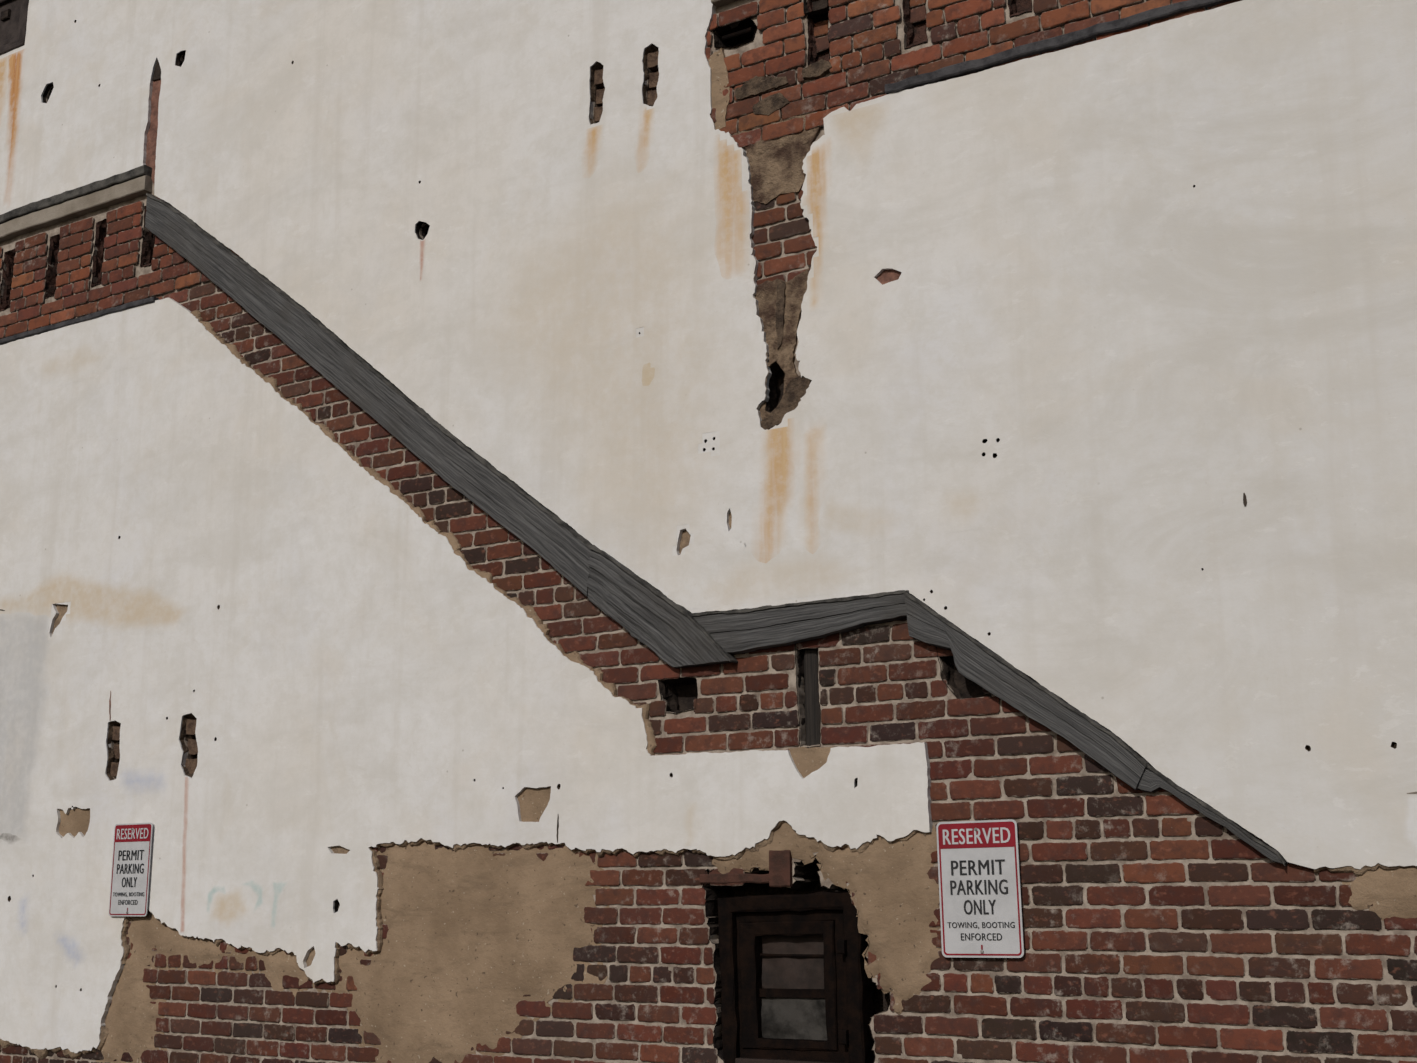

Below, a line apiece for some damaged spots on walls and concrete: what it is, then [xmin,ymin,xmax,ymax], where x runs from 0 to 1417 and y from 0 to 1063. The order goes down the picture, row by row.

rust [0,48,28,211]
spalling [708,48,832,430]
spalling [876,270,901,285]
rust [742,409,831,563]
spalling [788,747,833,778]
spalling [59,807,90,837]
spalling [517,787,551,822]
spalling [1314,863,1417,921]
spalling [0,820,954,1063]